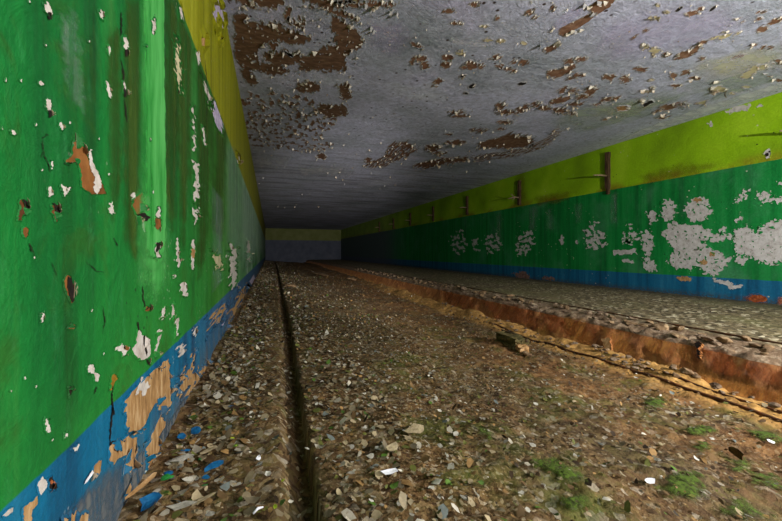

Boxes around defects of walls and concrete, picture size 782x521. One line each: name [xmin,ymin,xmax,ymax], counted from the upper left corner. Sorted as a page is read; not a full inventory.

peeling [171,32,225,227]
peeling [208,0,400,161]
peeling [362,0,782,173]
peeling [46,133,116,223]
peeling [448,229,503,255]
peeling [515,226,537,257]
peeling [575,179,782,290]
peeling [43,416,80,454]
crack [94,387,115,446]
peeling [85,236,256,511]
peeling [1,475,58,521]
peeling [60,506,90,521]